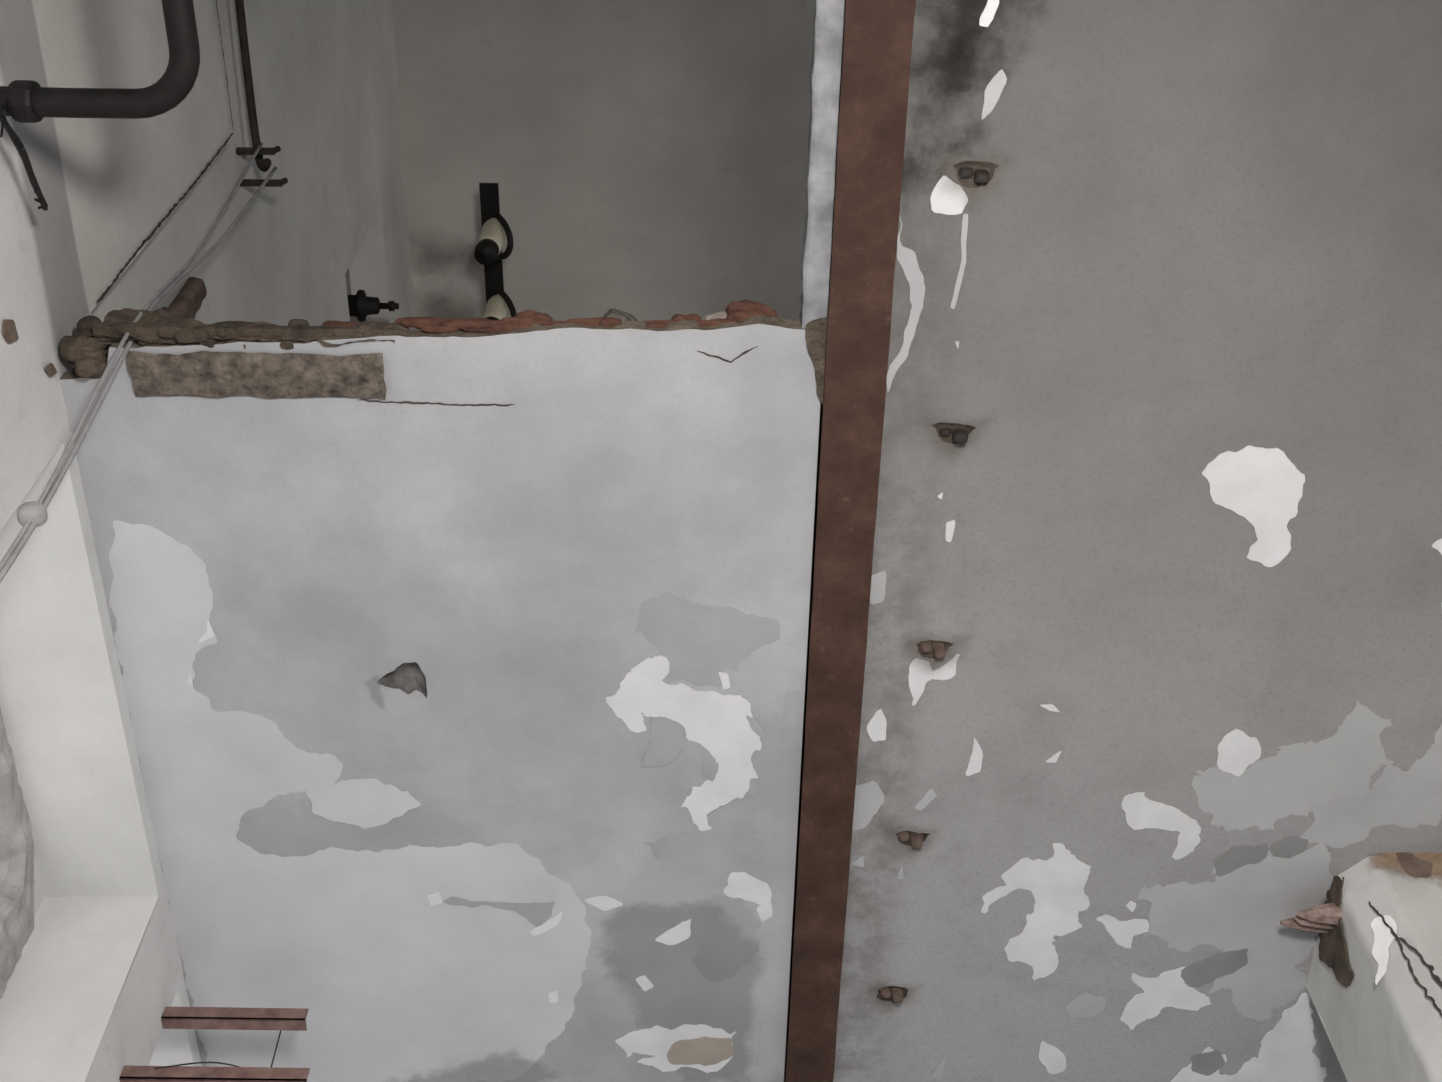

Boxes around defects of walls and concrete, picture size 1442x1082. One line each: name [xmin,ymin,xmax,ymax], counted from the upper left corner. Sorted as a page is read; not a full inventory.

flaking render [2,319,19,344]
spalling [45,308,622,400]
peeling [1202,445,1305,567]
peeling [870,570,886,604]
peeling [908,640,960,706]
peeling [867,709,887,742]
peeling [109,520,623,1082]
peeling [606,593,781,983]
peeling [852,781,885,831]
peeling [981,700,1442,1082]
crack [1369,901,1442,1016]
peeling [615,1024,737,1073]